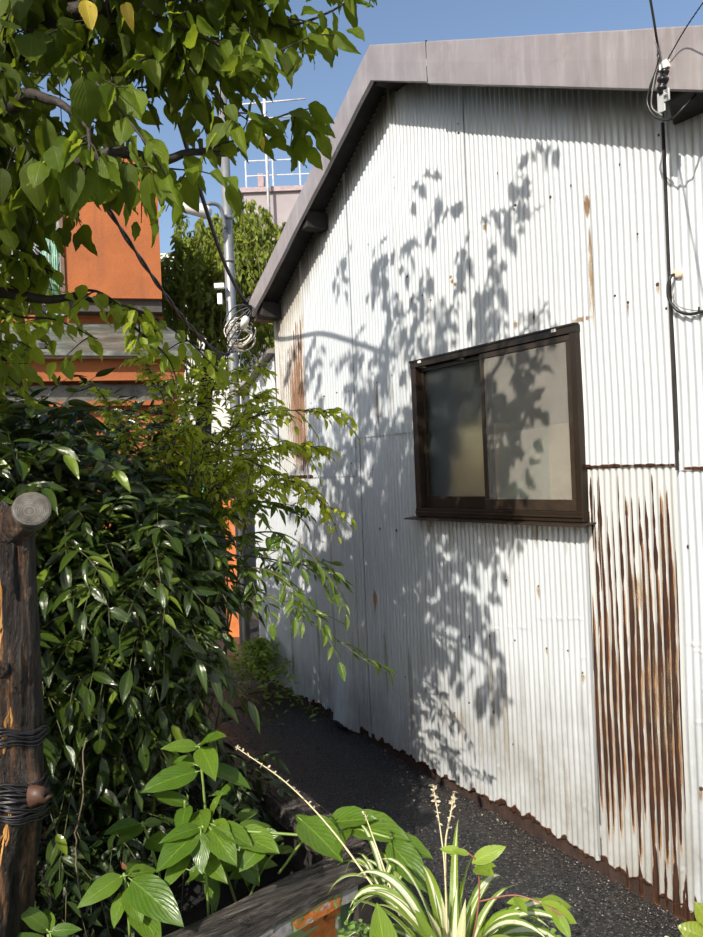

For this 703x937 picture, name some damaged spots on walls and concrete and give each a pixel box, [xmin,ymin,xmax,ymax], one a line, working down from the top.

corrosion [283,320,313,479]
corrosion [360,463,703,922]